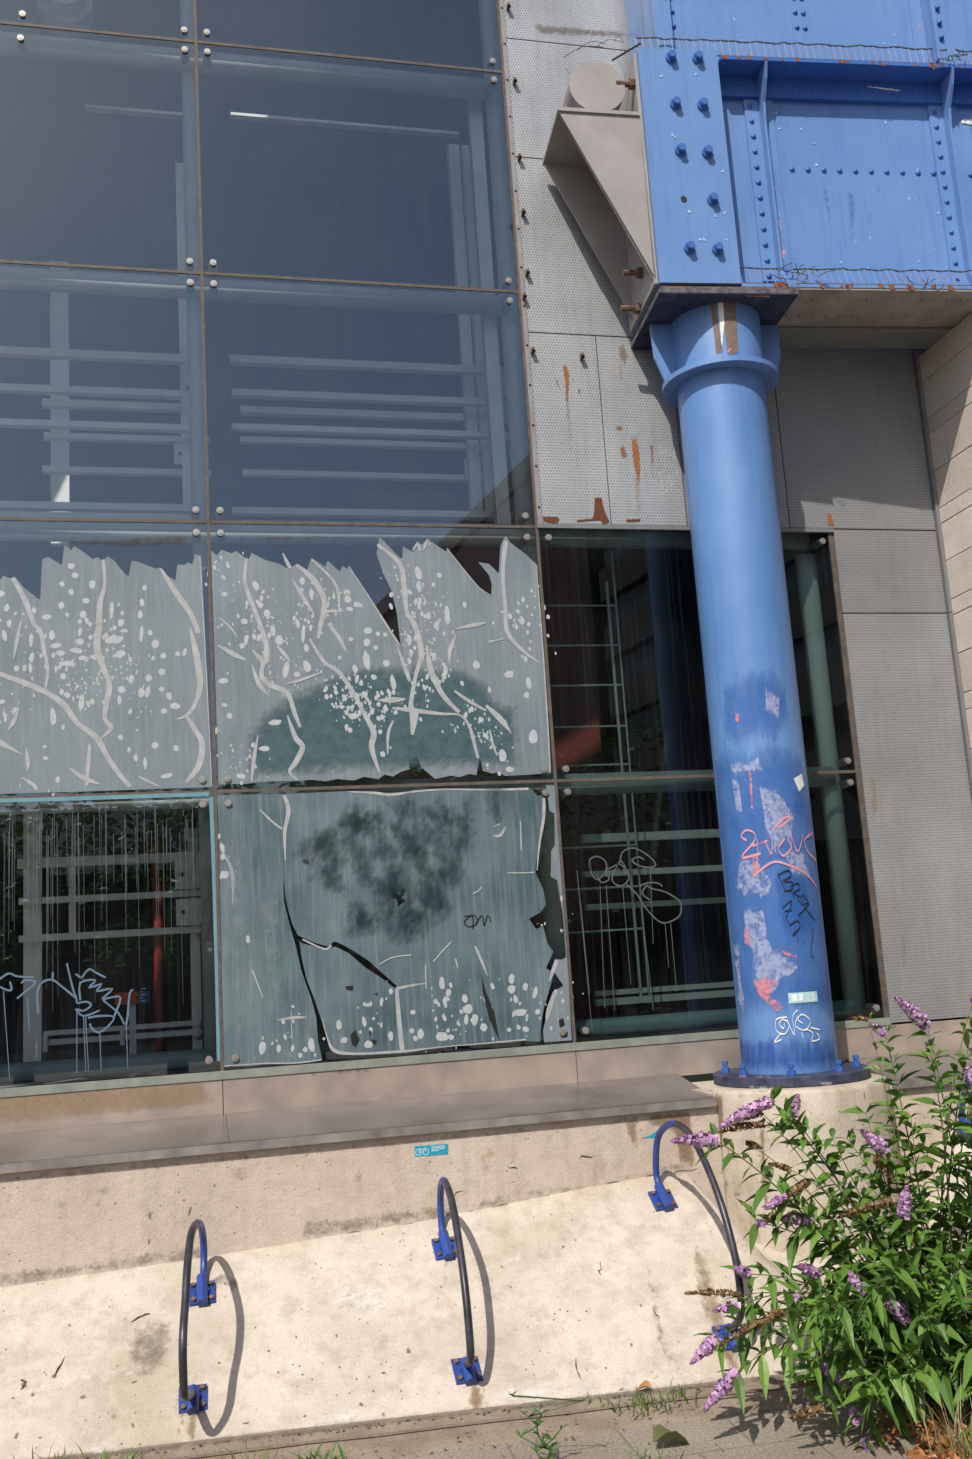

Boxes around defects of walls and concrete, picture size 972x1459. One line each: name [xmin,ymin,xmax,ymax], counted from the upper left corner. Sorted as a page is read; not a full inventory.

corrosion [878,283,955,291]
corrosion [710,282,789,355]
corrosion [556,365,580,400]
corrosion [617,427,653,478]
corrosion [577,498,640,524]